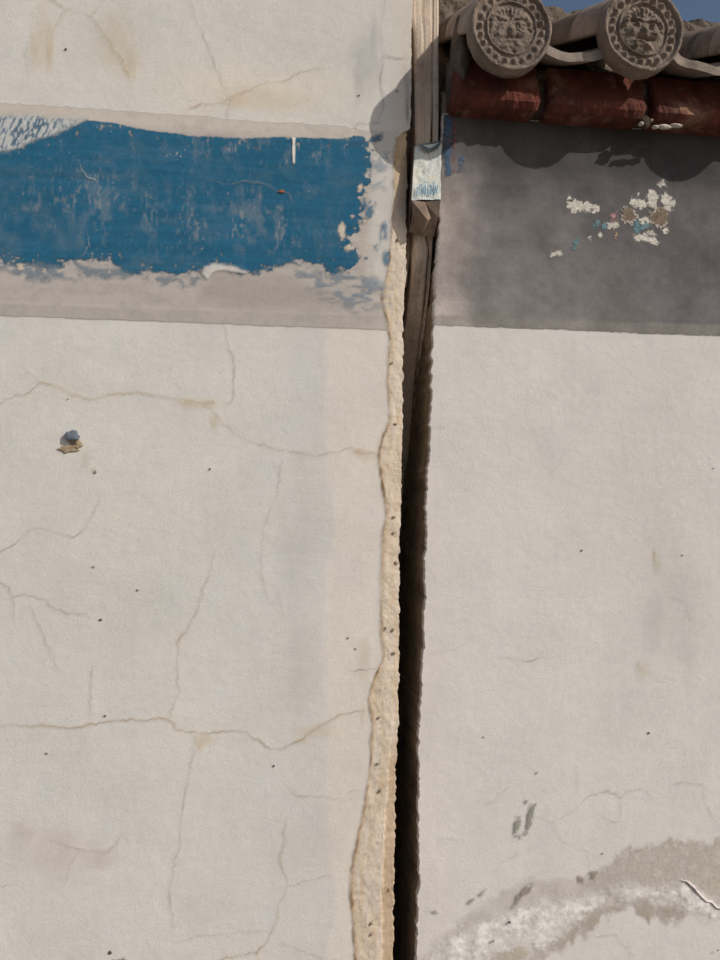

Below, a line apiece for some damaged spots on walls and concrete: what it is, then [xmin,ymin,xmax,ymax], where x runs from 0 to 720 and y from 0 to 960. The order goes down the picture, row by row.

peeling [550,179,676,257]
peeling [0,115,408,960]
damp [551,839,720,949]